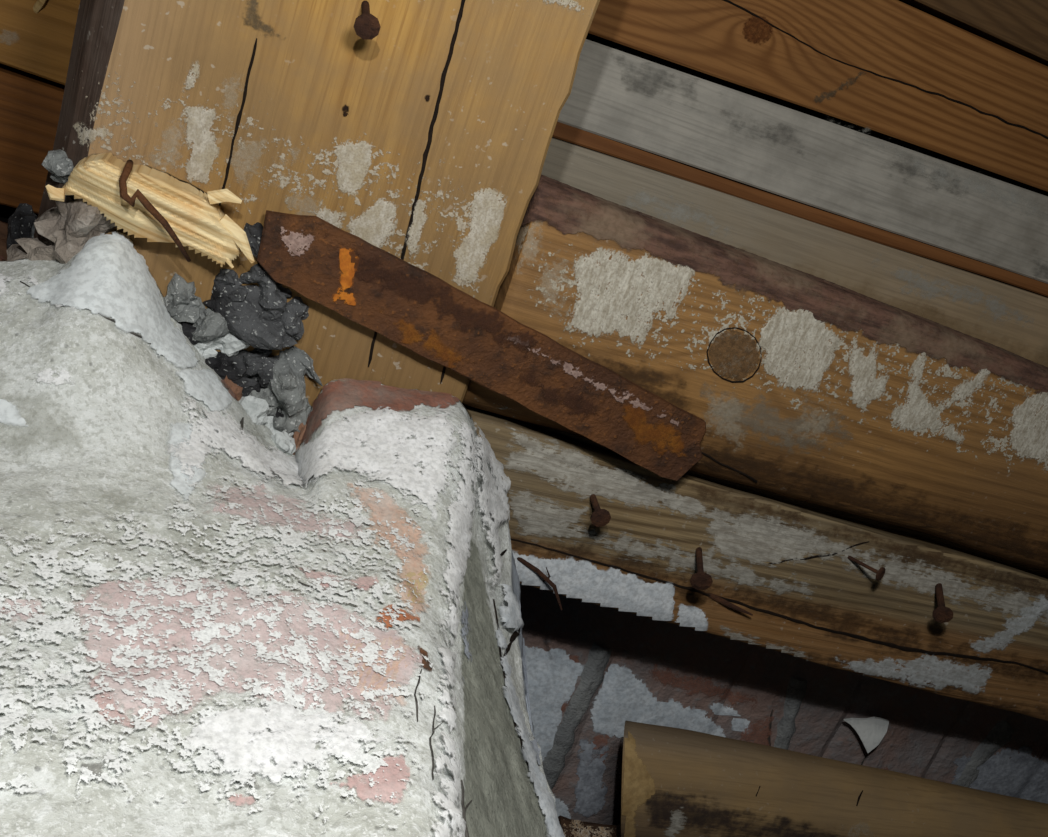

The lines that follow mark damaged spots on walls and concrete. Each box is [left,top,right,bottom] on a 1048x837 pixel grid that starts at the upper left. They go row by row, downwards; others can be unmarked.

crack [219,38,257,206]
crack [401,0,465,260]
crack [723,0,1048,139]
corrosion [333,248,358,306]
corrosion [624,405,685,456]